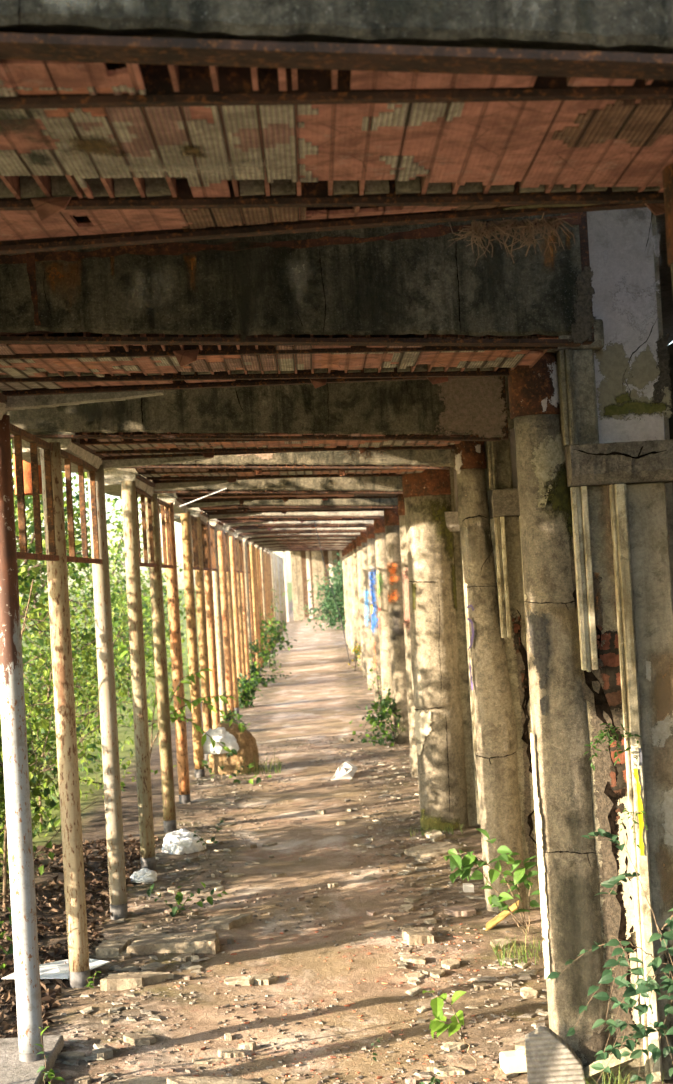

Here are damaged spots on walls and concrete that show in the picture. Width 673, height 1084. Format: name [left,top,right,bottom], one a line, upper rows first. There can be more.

flaking render [567,266,673,421]
flaking render [434,376,510,439]
crack [574,446,666,459]
crack [461,515,494,589]
flaking render [414,709,432,755]
crack [409,581,450,816]
crack [476,536,670,1049]